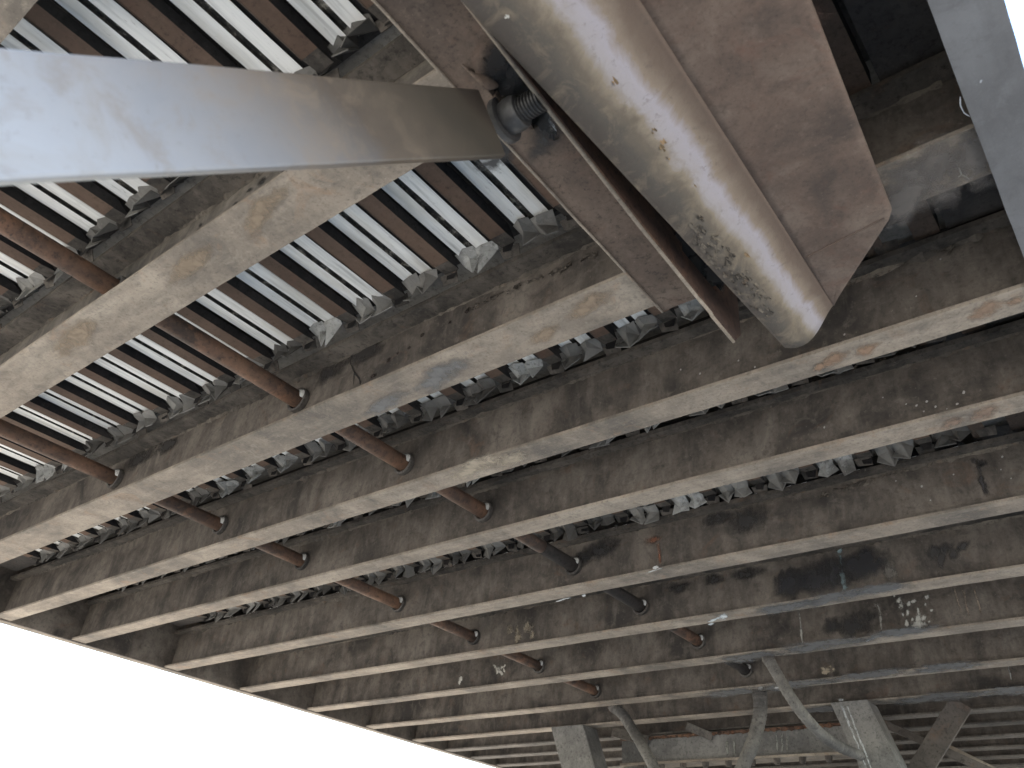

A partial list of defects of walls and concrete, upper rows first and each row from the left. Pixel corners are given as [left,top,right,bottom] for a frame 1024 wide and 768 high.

damp [722,547,936,663]